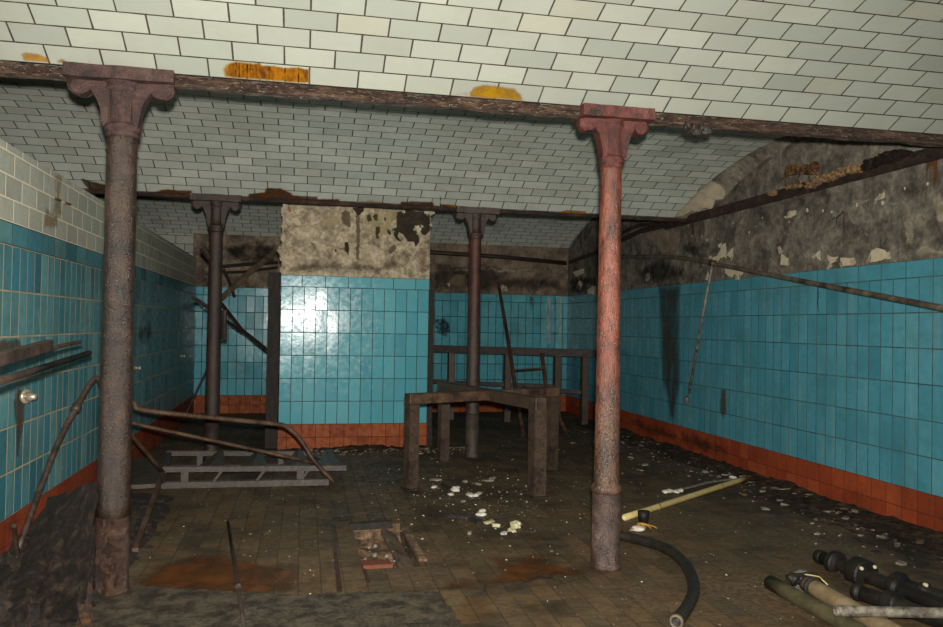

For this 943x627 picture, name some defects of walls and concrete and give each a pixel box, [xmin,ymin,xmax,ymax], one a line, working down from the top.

rust [224,62,309,83]
rust [470,86,521,100]
rust [82,179,105,190]
spalling [341,210,350,227]
spalling [280,207,301,273]
spalling [367,209,435,254]
peeling [702,236,743,280]
peeling [778,246,790,265]
peeling [811,248,891,270]
damp [643,263,682,414]
rust [143,556,293,593]